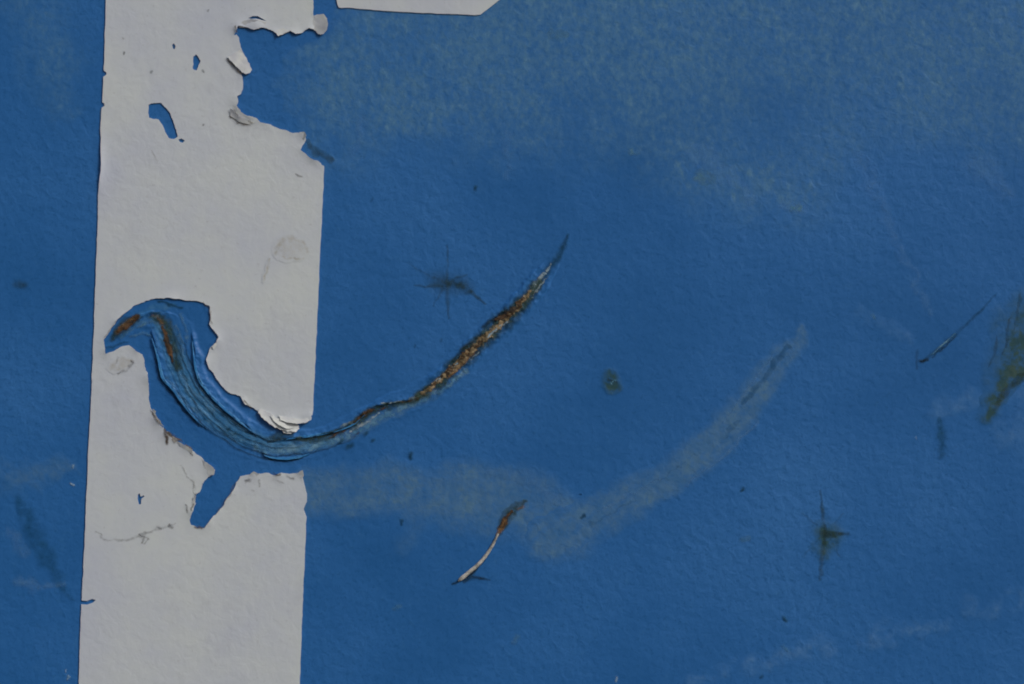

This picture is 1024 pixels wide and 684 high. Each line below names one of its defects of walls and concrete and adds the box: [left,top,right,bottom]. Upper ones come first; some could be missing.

peeling [148,103,185,143]
peeling [228,0,334,153]
rust [112,313,181,371]
spalling [104,235,568,529]
rust [295,279,543,440]
rust [496,500,527,535]